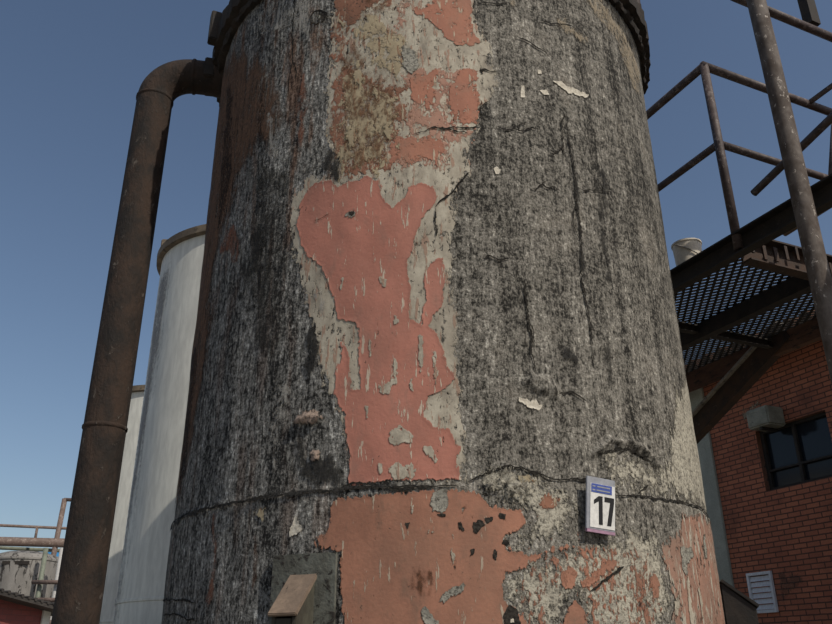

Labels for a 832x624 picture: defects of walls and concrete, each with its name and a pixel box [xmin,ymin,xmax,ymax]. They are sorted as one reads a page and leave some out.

crack [417,125,477,133]
crack [497,122,540,132]
crack [434,172,469,236]
crack [533,114,611,360]
peeling [289,0,725,624]
crack [523,276,536,371]
crack [171,447,711,529]